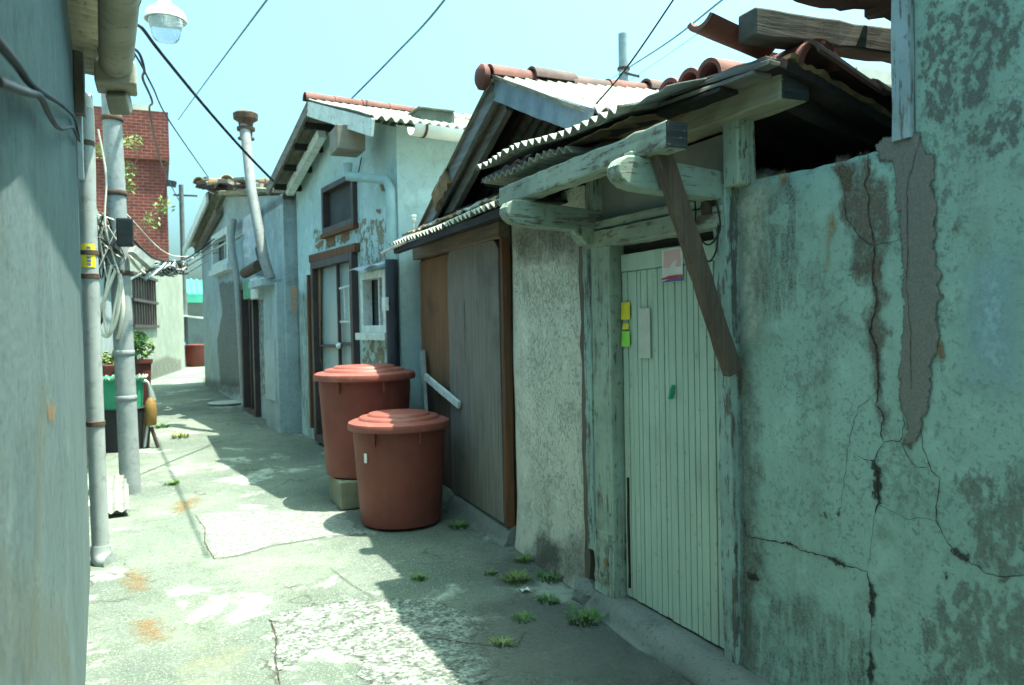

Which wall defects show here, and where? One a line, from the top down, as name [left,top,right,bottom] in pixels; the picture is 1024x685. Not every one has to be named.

peeling [313,209,387,266]
water stain [836,155,891,391]
crack [744,138,1021,685]